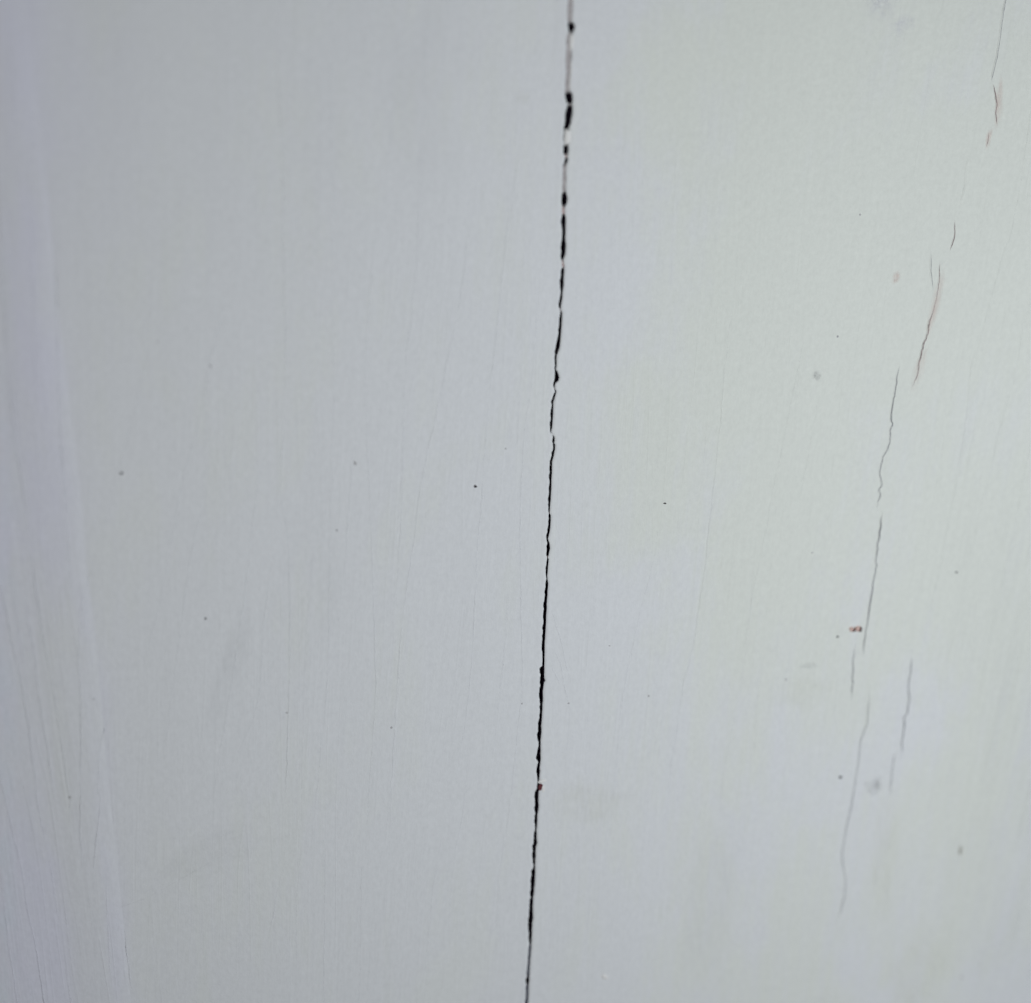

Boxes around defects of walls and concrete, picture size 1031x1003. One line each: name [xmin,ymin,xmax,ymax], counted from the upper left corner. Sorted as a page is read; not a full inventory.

crack [525,0,575,1003]
crack [836,0,1007,924]